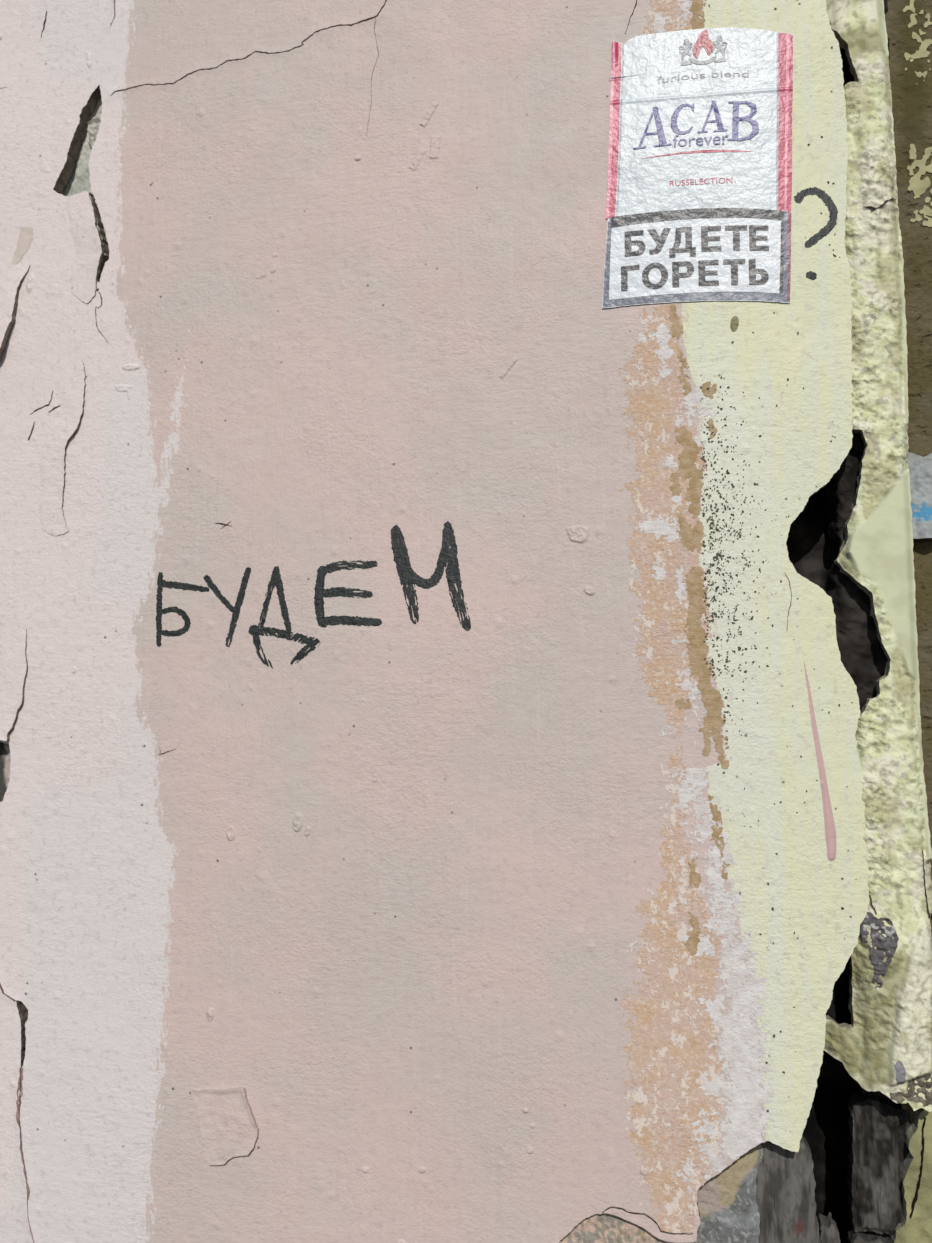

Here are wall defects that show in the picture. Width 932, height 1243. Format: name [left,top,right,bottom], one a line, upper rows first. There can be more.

crack [111,0,387,136]
peeling [62,99,108,304]
peeling [0,226,33,356]
peeling [37,359,86,536]
peeling [0,624,28,802]
peeling [559,304,775,1243]
crack [16,1068,34,1243]
spalling [890,1061,932,1106]